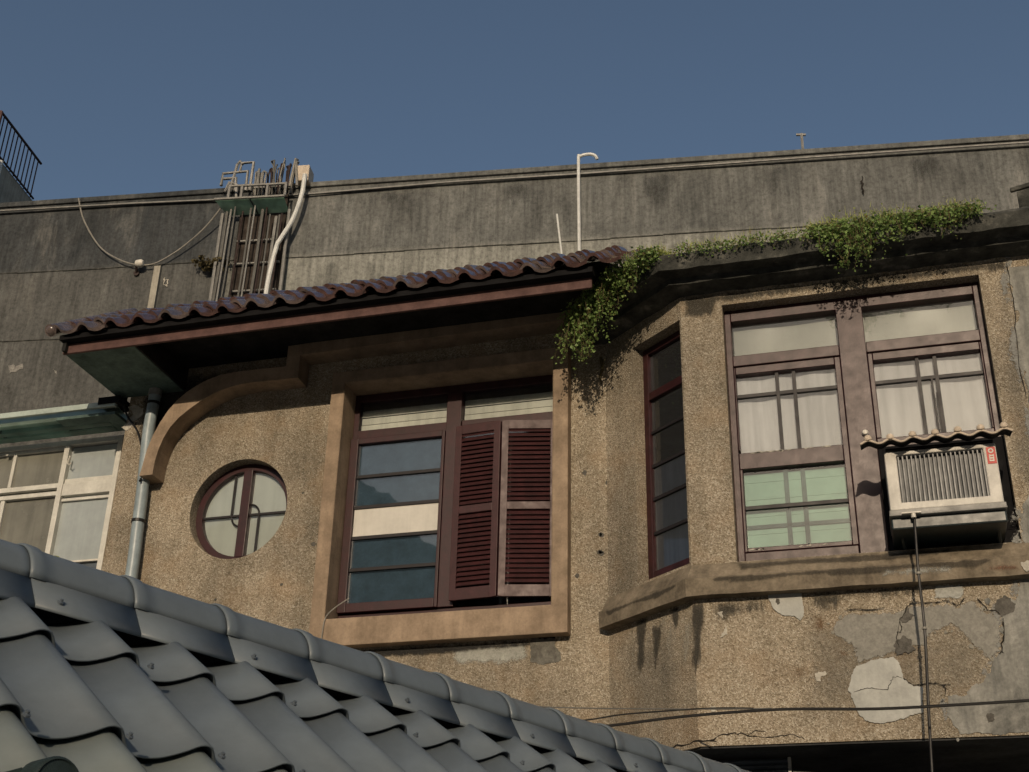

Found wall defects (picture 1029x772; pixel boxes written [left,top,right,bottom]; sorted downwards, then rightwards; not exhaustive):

peeling [1000,257,1029,438]
crack [1006,262,1027,399]
peeling [1012,495,1029,543]
leakage [637,618,661,669]
leakage [672,602,704,670]
leakage [718,603,762,617]
peeling [828,560,1029,742]